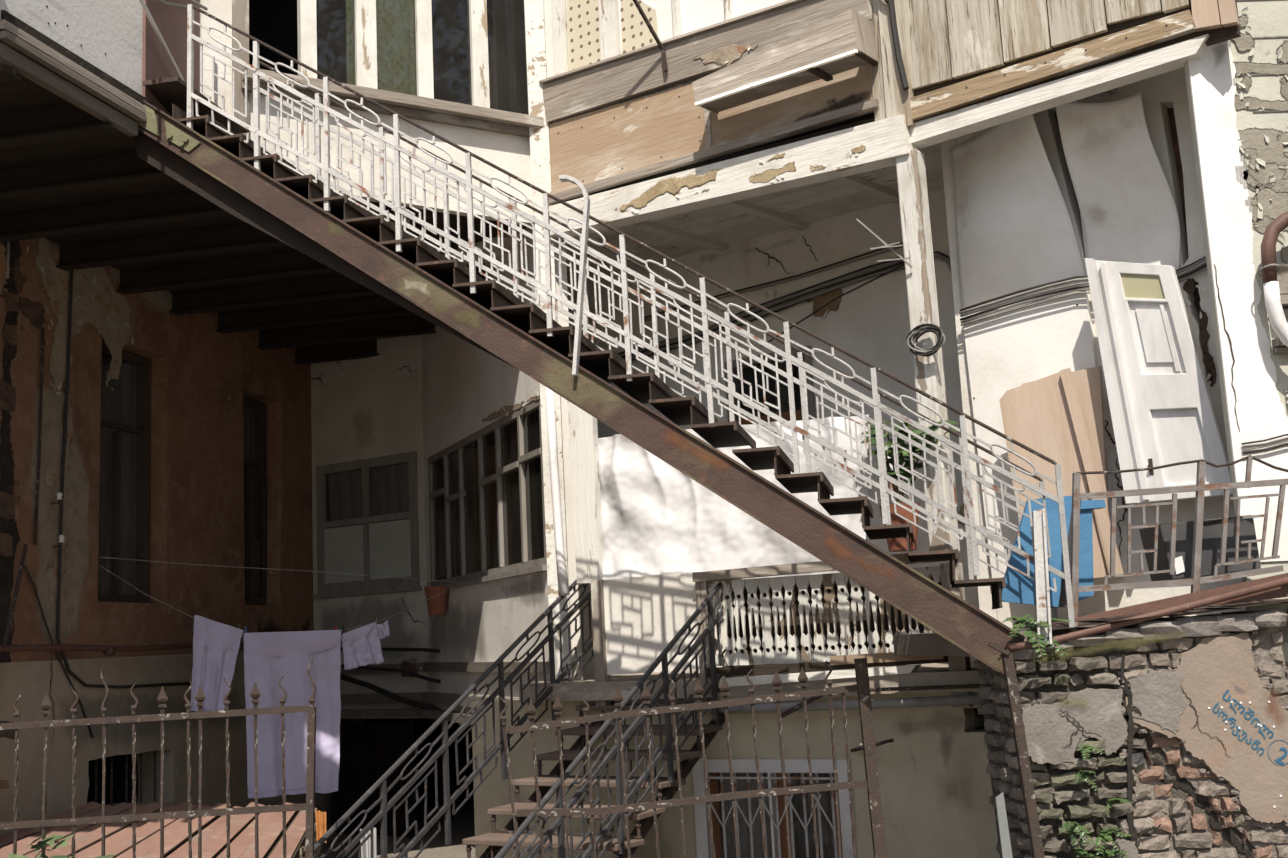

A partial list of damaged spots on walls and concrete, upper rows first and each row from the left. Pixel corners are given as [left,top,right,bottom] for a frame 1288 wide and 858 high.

peeling [693,44,758,66]
peeling [1232,6,1288,111]
peeling [615,169,717,213]
peeling [749,153,826,183]
peeling [1235,127,1288,263]
peeling [4,238,134,640]
corrosion [668,433,727,468]
crack [1059,654,1254,858]